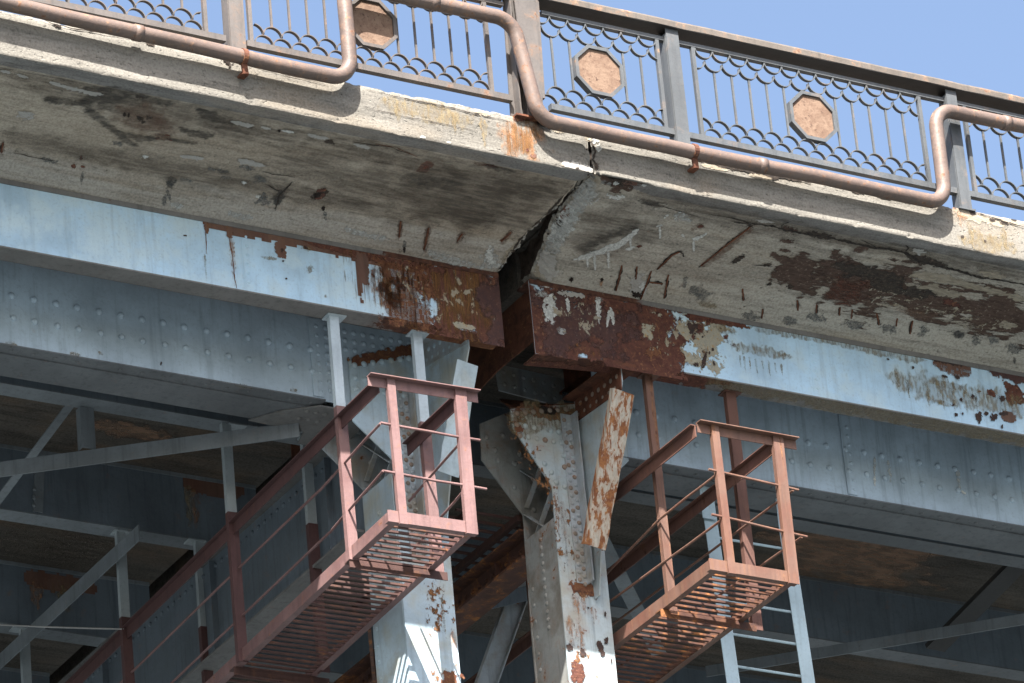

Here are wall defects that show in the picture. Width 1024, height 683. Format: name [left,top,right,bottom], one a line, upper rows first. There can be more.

water stain [44,87,264,184]
rust [501,116,542,161]
crack [585,137,602,170]
rust [203,222,505,366]
water stain [429,245,503,269]
spalling [755,239,1024,350]
spalling [956,208,1024,227]
peeling [674,313,790,380]
rust [524,284,1024,446]
rust [507,400,598,653]